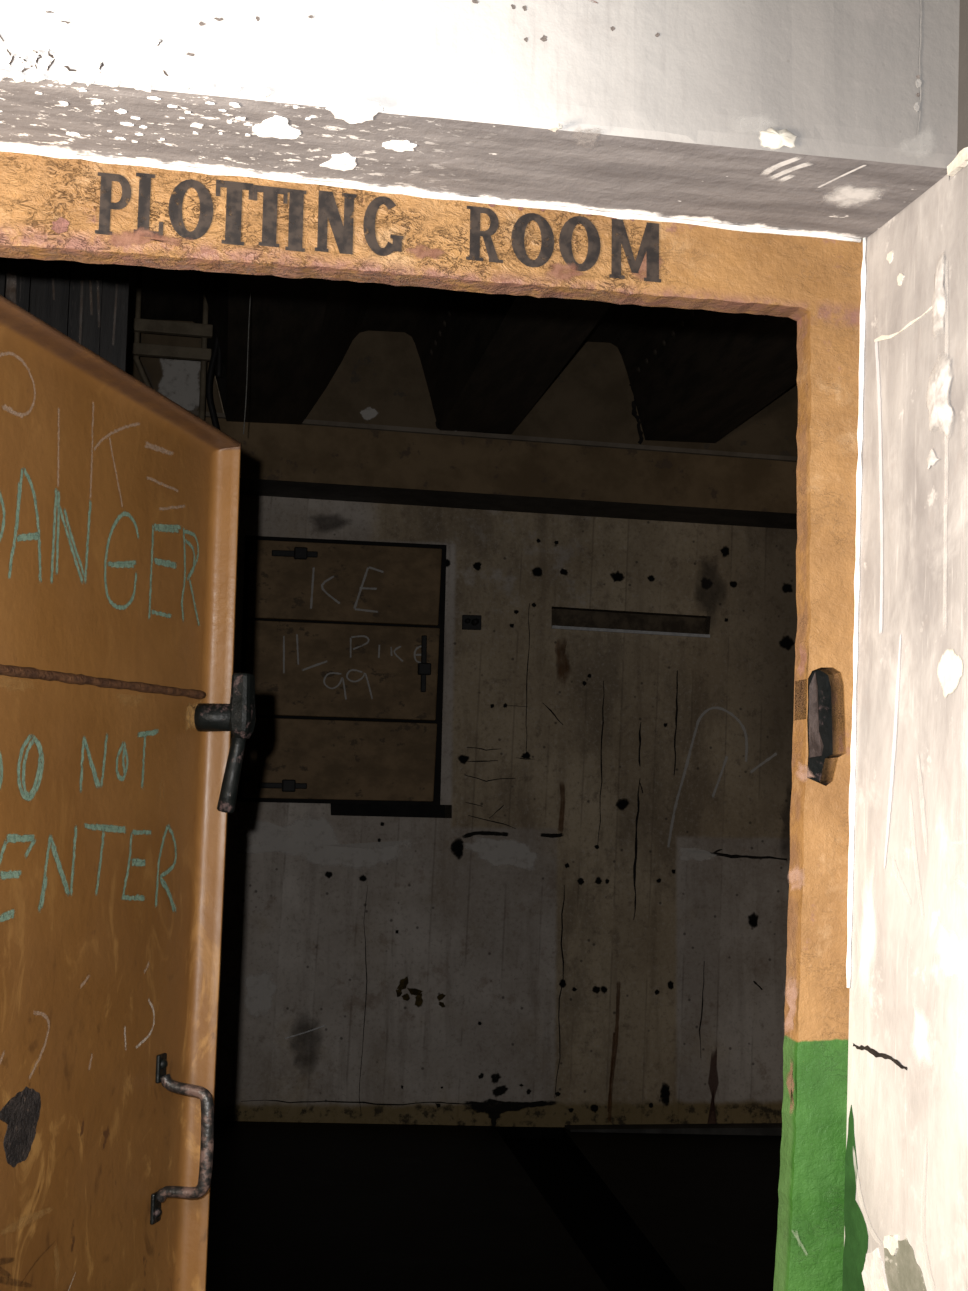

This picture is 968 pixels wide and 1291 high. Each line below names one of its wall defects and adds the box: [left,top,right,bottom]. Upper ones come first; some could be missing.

peeling [0,46,311,143]
peeling [326,97,383,124]
peeling [382,140,417,152]
peeling [320,152,357,171]
crack [853,1043,907,1070]
peeling [842,1105,927,1291]